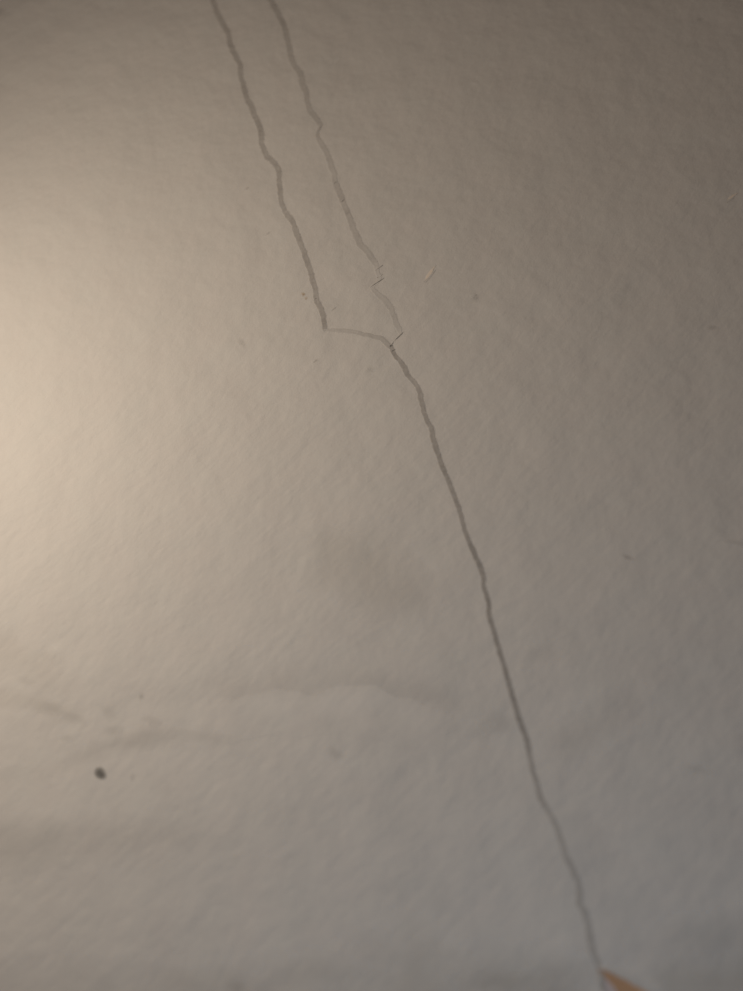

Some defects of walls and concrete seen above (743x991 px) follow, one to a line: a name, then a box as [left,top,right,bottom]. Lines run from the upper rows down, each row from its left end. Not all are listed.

crack [210,0,607,991]